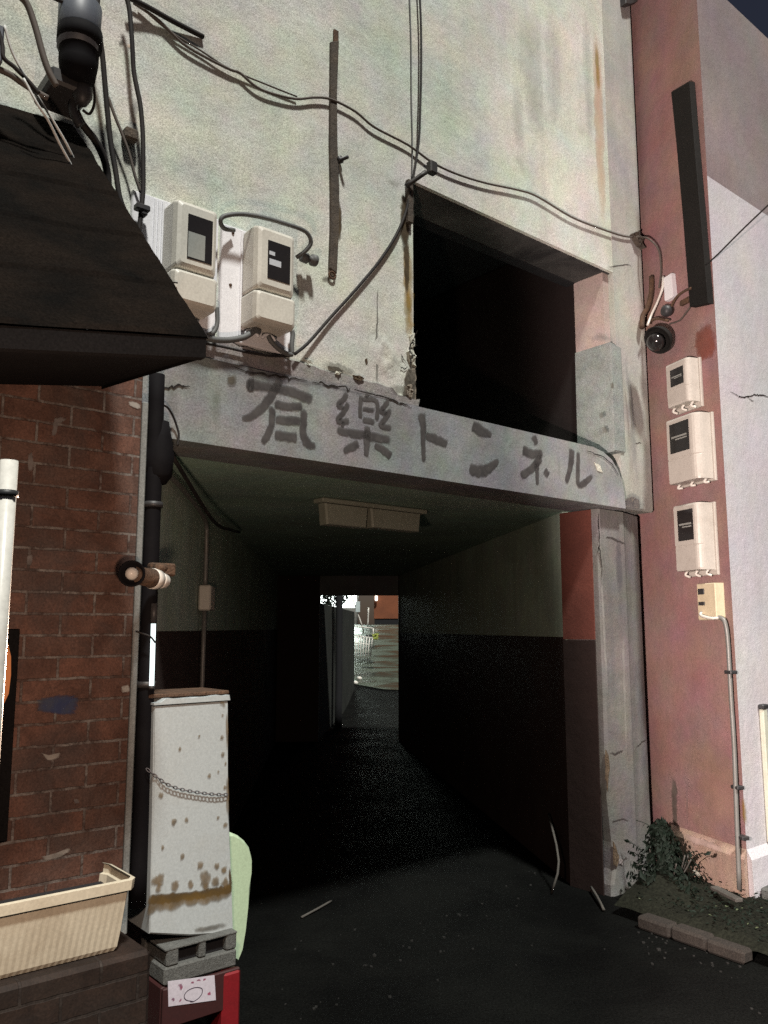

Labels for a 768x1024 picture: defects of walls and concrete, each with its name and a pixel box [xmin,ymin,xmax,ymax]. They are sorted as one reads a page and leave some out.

corrosion [401,196,414,324]
flaking render [328,363,364,381]
spalling [395,333,417,400]